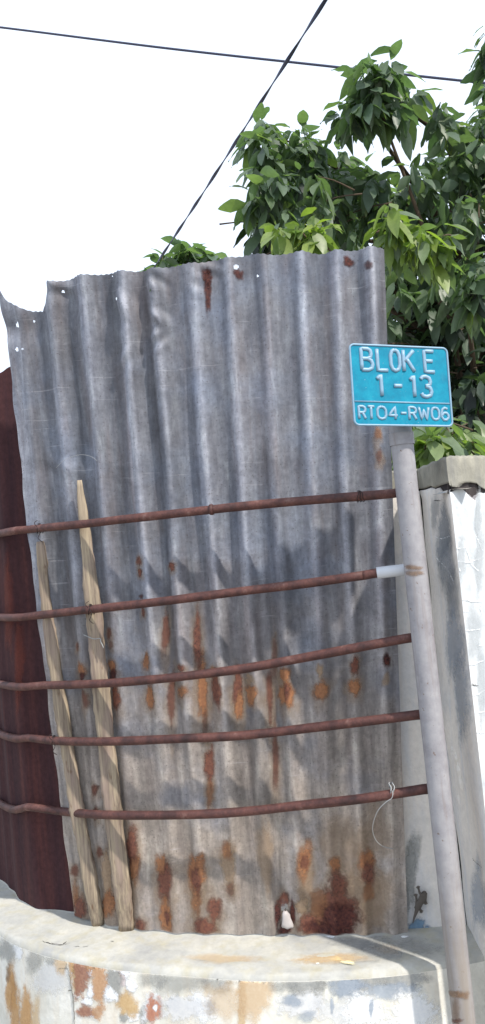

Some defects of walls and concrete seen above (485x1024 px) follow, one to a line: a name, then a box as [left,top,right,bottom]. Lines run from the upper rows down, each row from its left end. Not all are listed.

rust [202,269,212,309]
rust [0,564,420,786]
rust [0,784,428,882]
rust [156,855,172,932]
rust [188,843,235,934]
rust [275,857,359,936]
peeling [0,943,23,960]
peeling [34,960,230,1024]
peeling [276,989,439,1024]